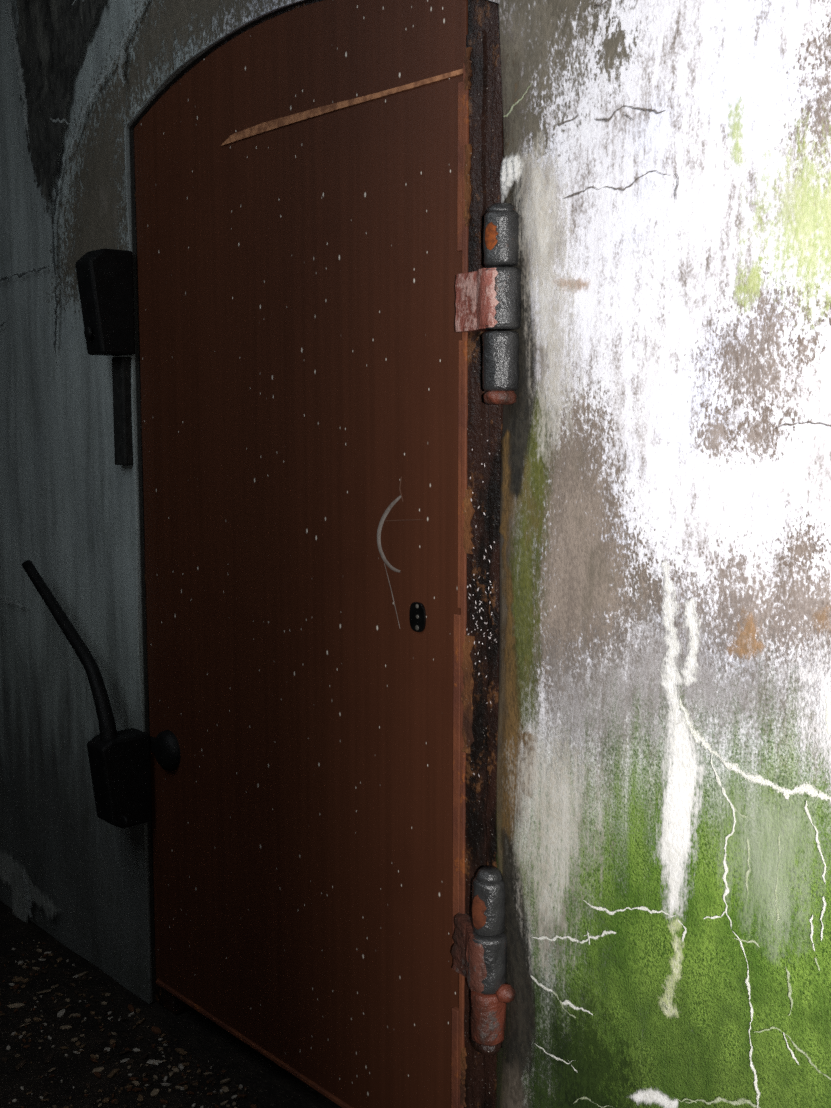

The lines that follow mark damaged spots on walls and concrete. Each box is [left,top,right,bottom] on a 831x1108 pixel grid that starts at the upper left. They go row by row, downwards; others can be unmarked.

damp [500,155,575,496]
crack [559,105,666,126]
crack [565,170,679,198]
damp [502,560,831,1108]
crack [531,696,831,1108]